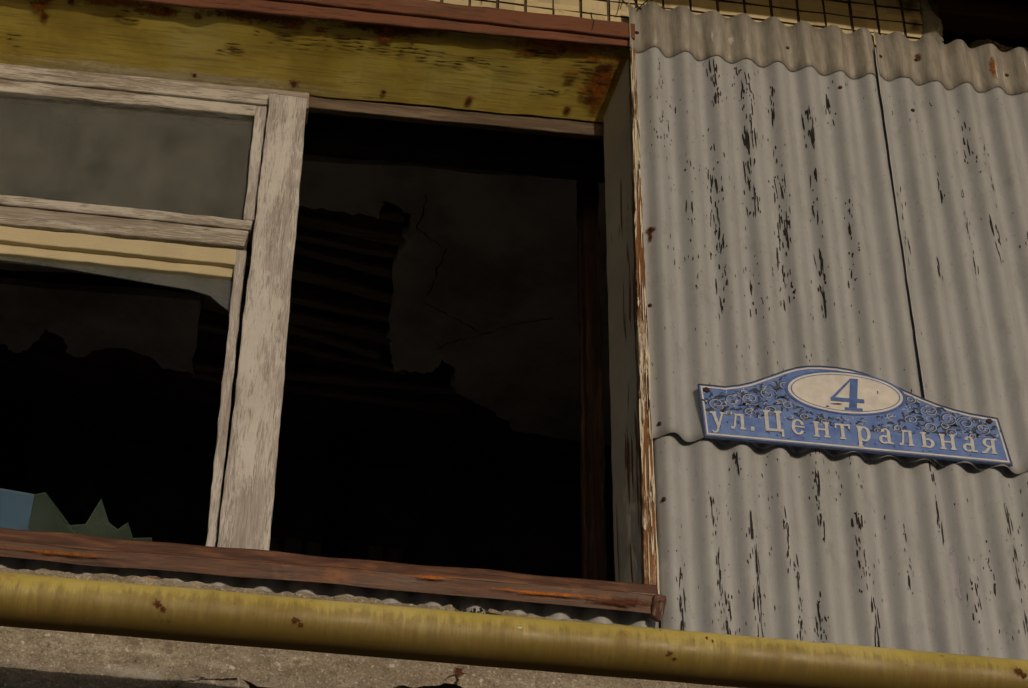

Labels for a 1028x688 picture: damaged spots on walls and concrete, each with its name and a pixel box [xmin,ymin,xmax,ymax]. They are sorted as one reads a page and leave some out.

corrosion [88,0,178,17]
corrosion [195,10,445,43]
peeling [570,48,681,243]
peeling [706,59,761,230]
peeling [670,128,796,320]
peeling [810,168,835,321]
peeling [623,253,677,594]
peeling [672,563,686,631]
peeling [712,512,775,637]
peeling [759,493,829,643]
peeling [809,450,842,543]
peeling [851,511,885,647]